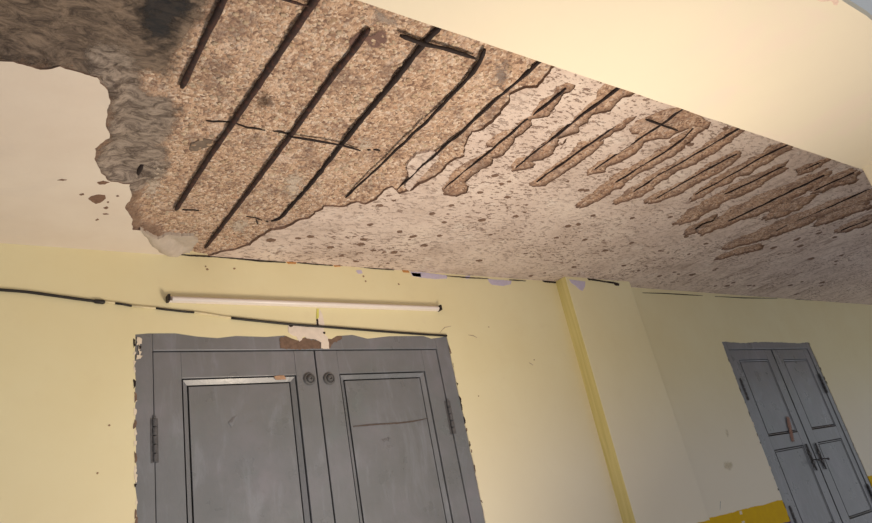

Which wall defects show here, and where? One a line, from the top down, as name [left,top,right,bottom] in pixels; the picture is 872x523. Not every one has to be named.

leakage [138,0,196,49]
spalling [0,0,872,305]
peeling [280,336,342,350]